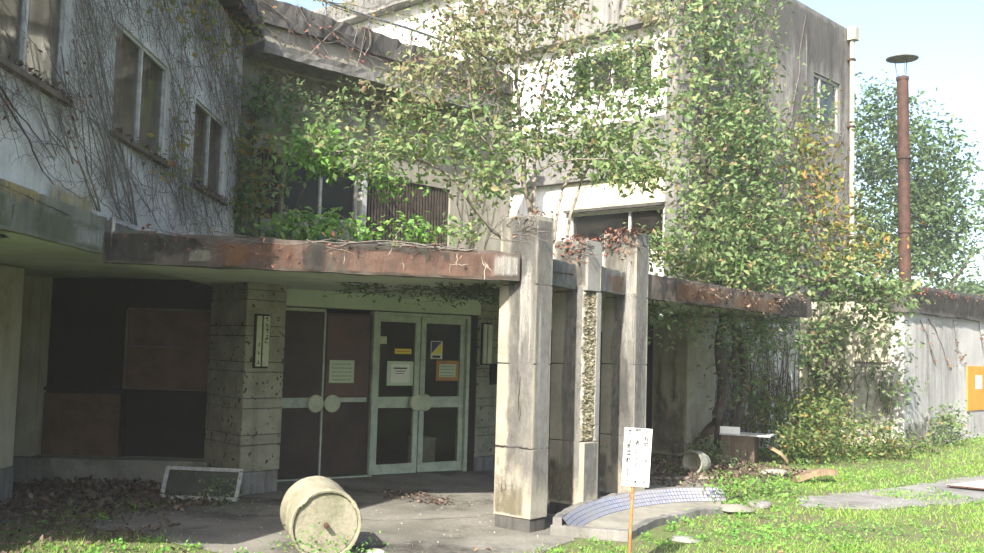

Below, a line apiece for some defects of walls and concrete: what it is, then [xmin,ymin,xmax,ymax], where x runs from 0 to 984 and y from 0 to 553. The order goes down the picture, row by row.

leakage [2,179,92,220]
corrosion [333,246,499,277]